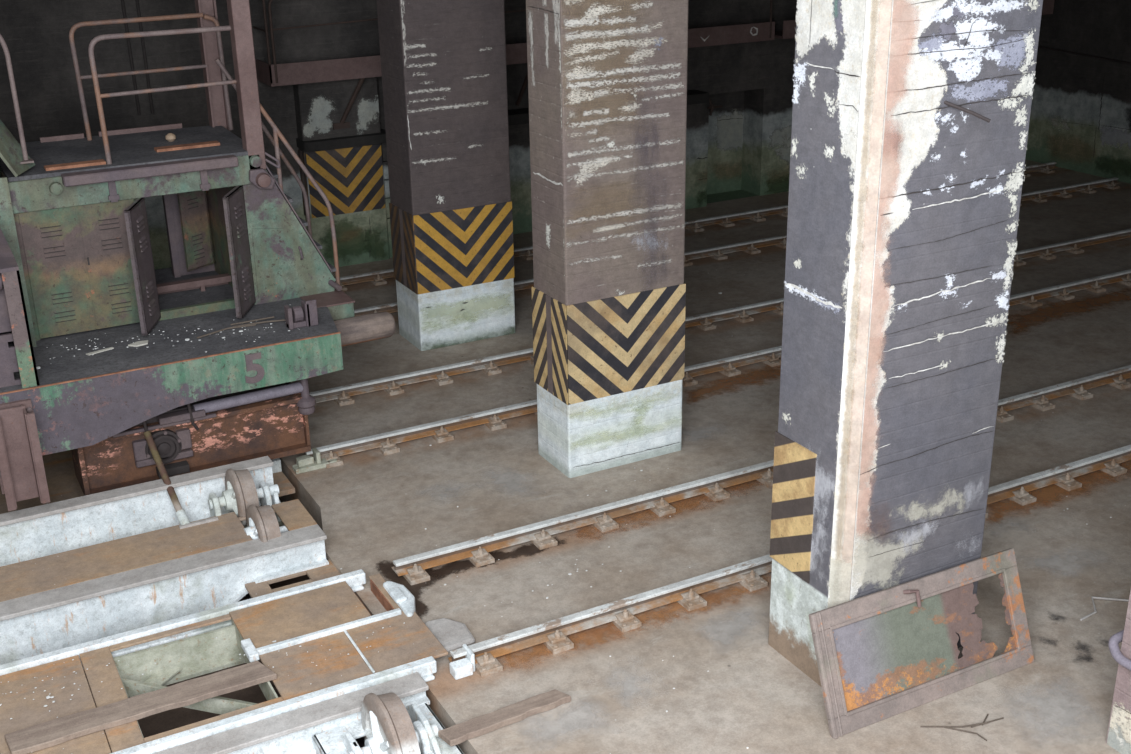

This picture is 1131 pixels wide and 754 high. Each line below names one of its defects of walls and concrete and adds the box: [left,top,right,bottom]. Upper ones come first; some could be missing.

peeling [528,0,684,150]
corrosion [856,0,915,536]
peeling [784,0,1040,601]